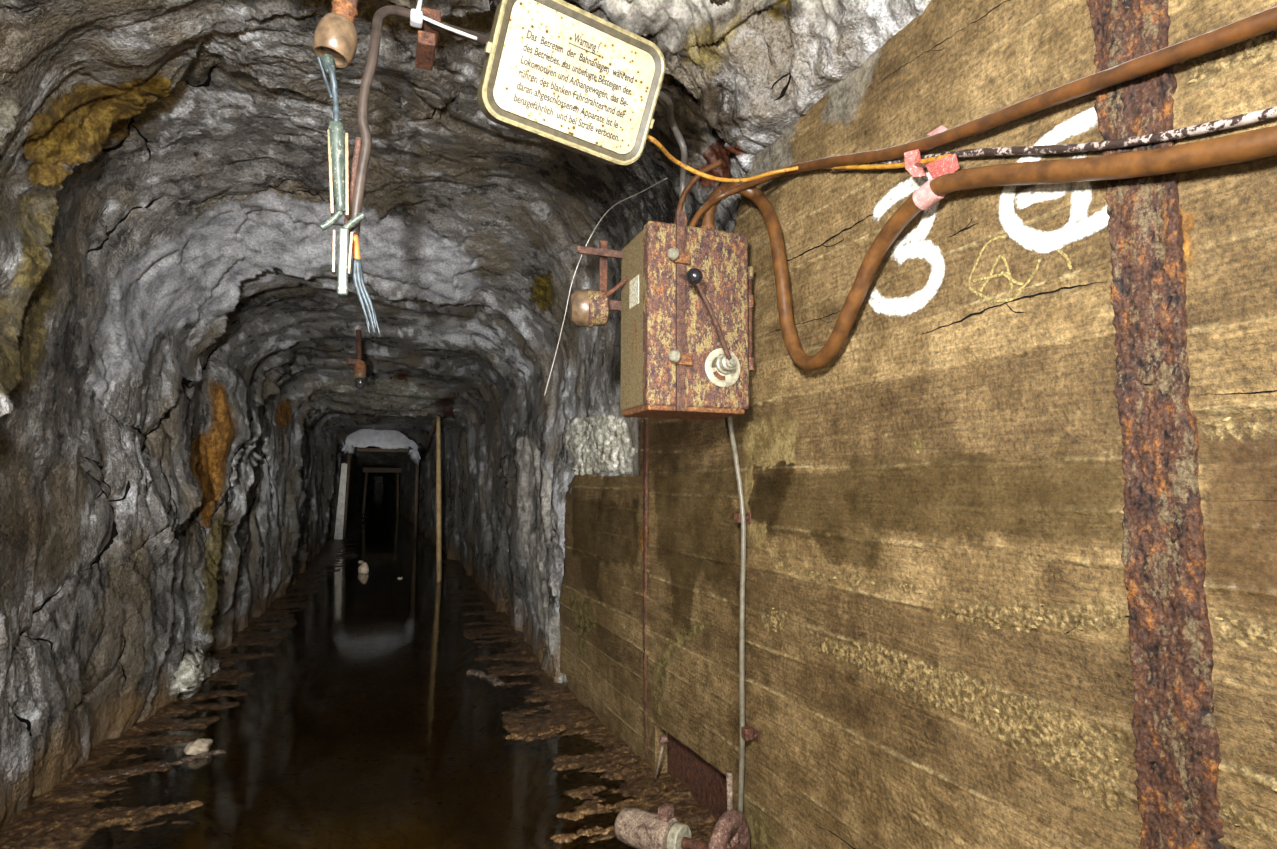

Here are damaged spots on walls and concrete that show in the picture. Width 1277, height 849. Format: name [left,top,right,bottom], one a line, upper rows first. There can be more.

rust [1180,210,1194,264]
crack [1195,389,1277,397]